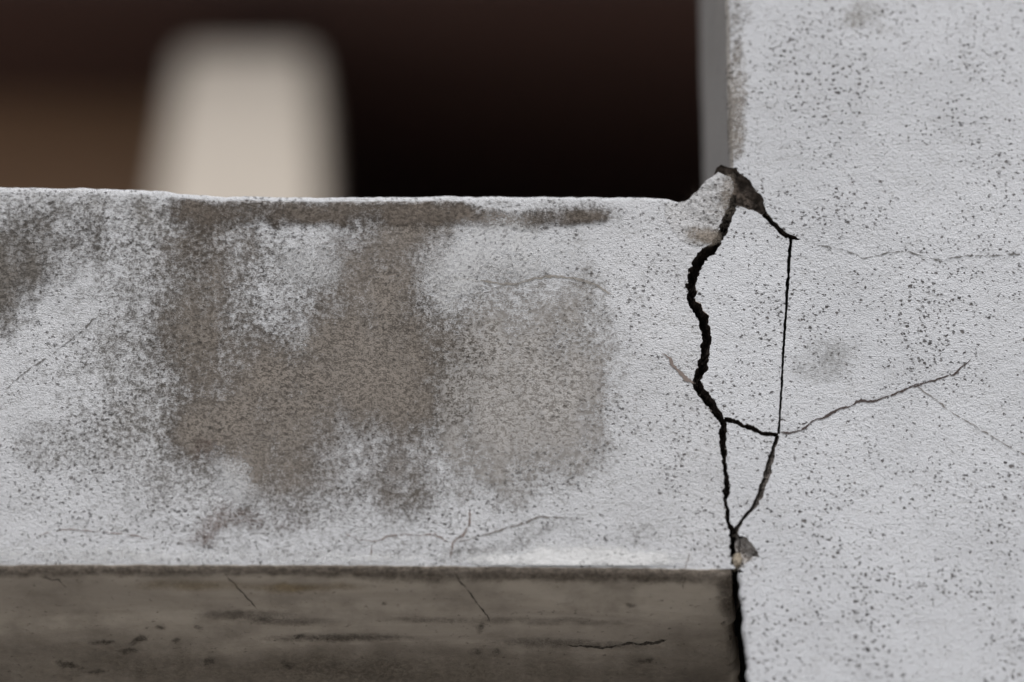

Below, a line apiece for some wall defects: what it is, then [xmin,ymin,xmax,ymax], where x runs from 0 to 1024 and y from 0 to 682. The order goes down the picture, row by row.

water stain [0,194,619,522]
crack [662,195,1024,682]